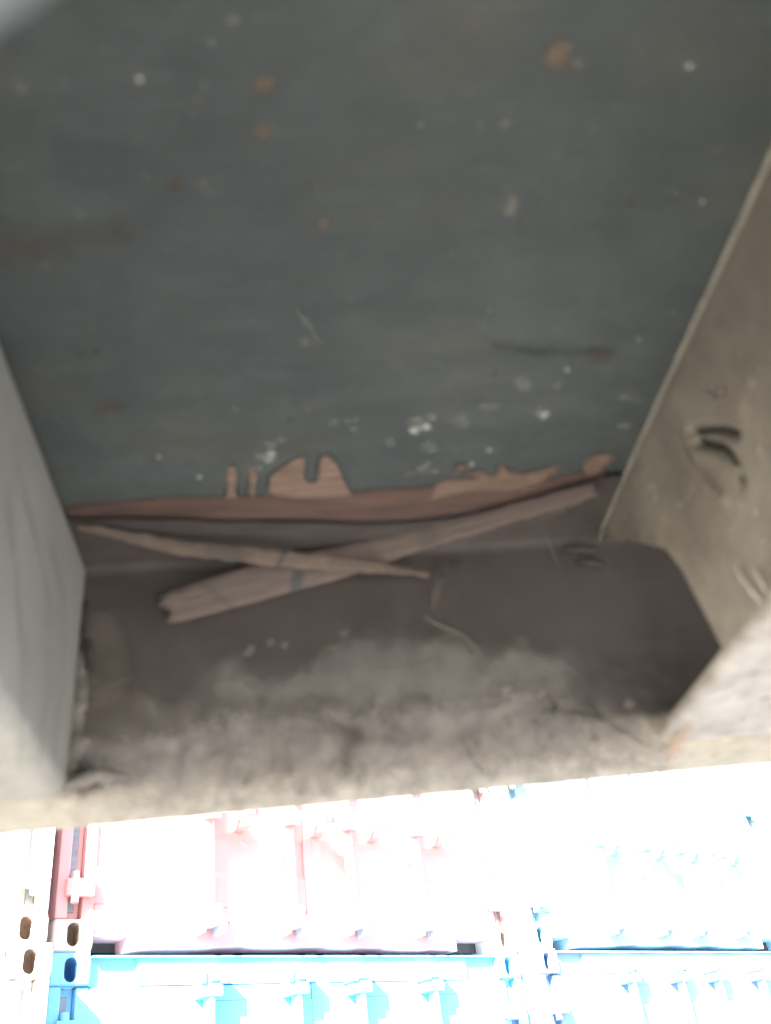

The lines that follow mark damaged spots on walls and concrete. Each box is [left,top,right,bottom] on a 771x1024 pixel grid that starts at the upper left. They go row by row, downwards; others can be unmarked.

peeling [64,453,611,525]